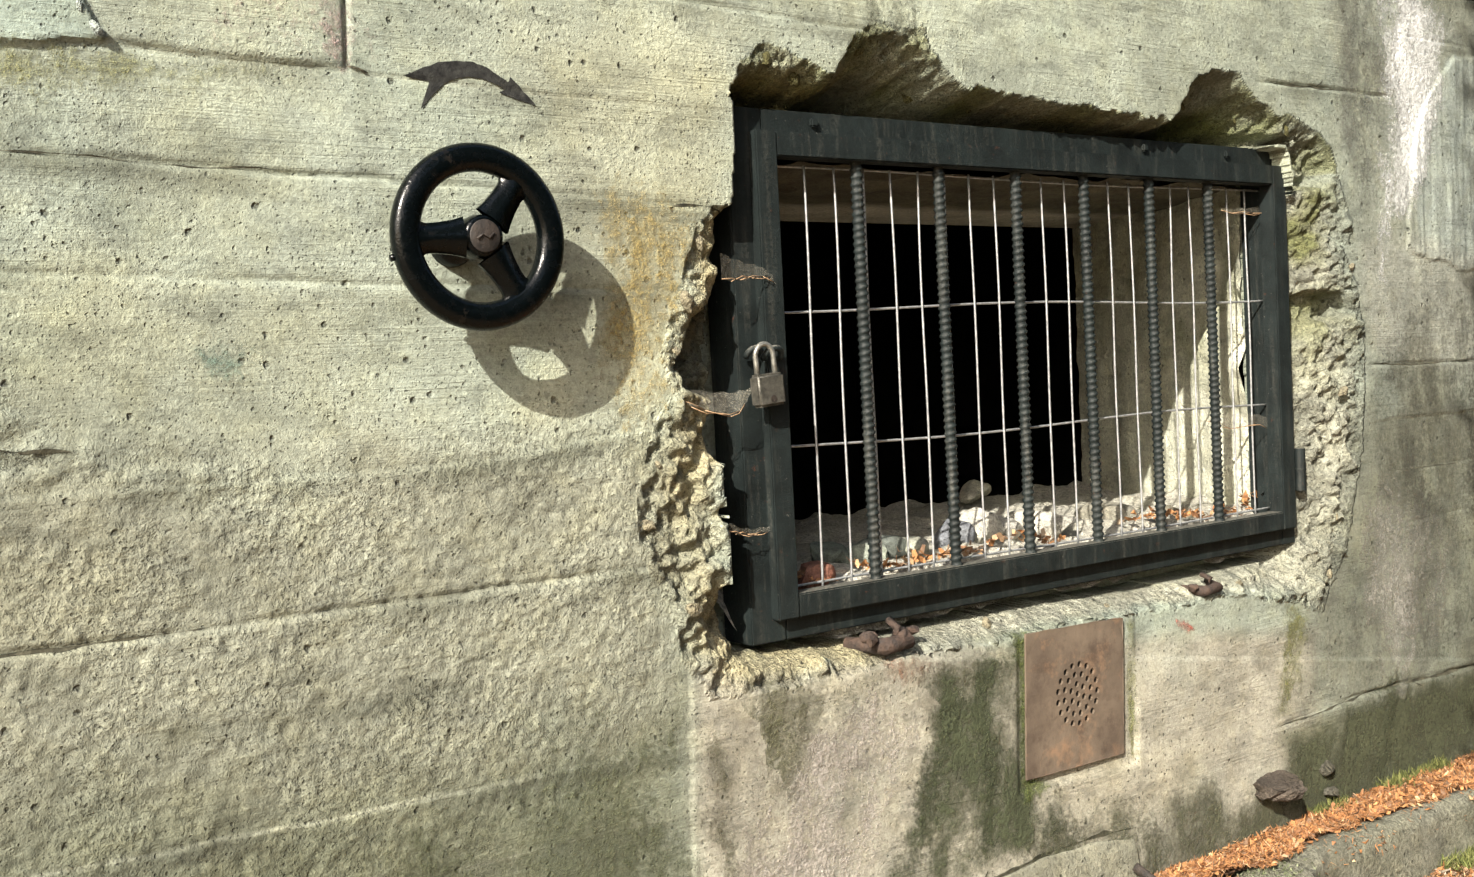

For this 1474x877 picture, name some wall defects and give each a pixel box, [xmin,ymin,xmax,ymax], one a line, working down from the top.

crack [344,7,368,73]
water stain [1340,0,1442,226]
crack [0,448,69,456]
spalling [636,20,1366,699]
water stain [1368,341,1474,657]
water stain [907,703,962,851]